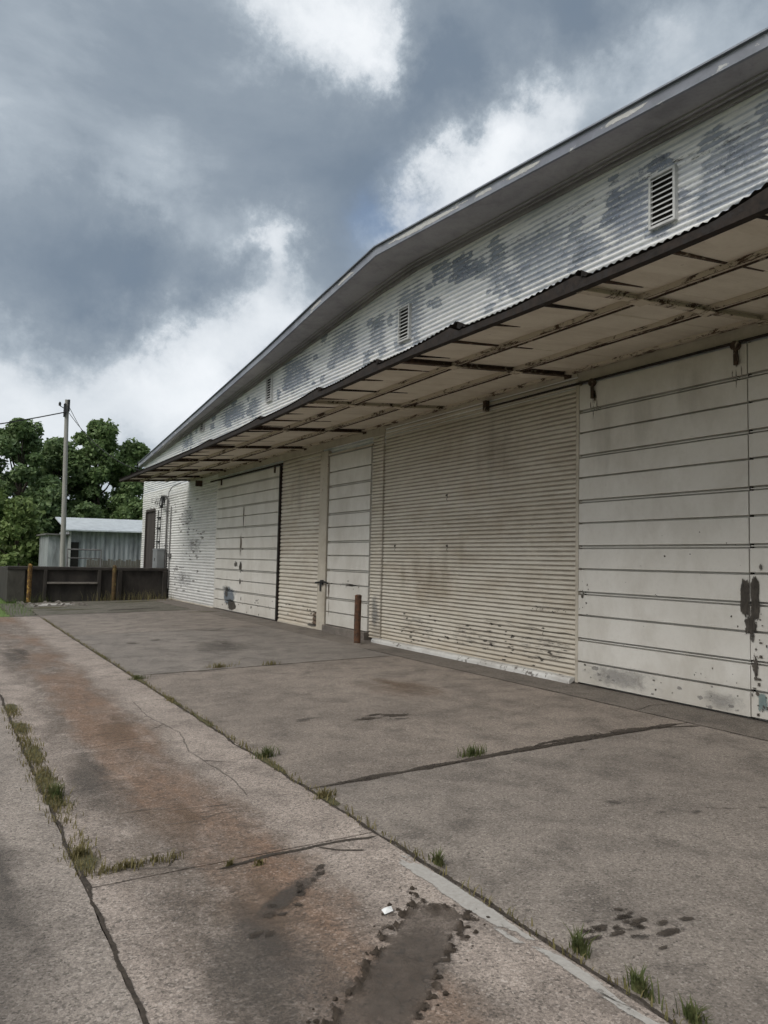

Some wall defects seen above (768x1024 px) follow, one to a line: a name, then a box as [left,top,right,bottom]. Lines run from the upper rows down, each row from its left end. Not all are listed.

peeling [277,100,768,400]
crack [0,610,768,1024]
peeling [751,639,768,716]